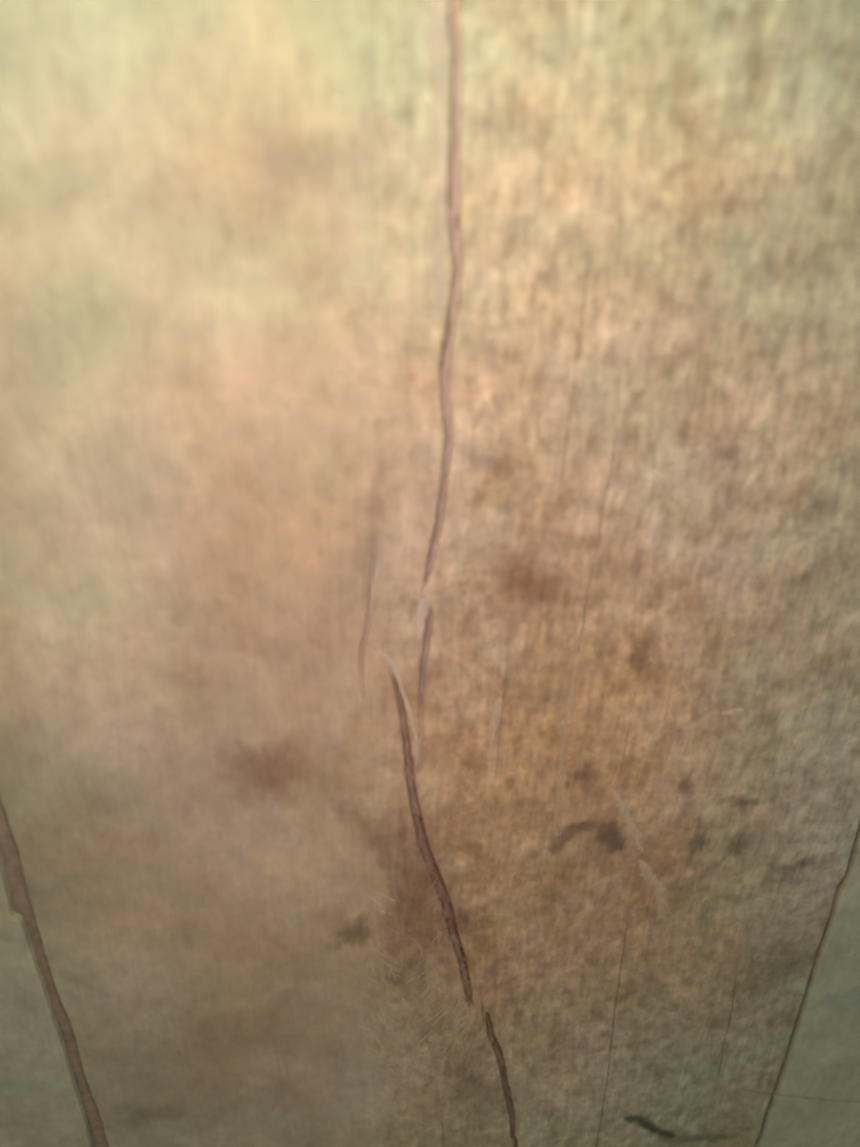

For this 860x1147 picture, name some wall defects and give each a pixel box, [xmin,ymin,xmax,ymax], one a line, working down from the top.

crack [359,0,518,1147]